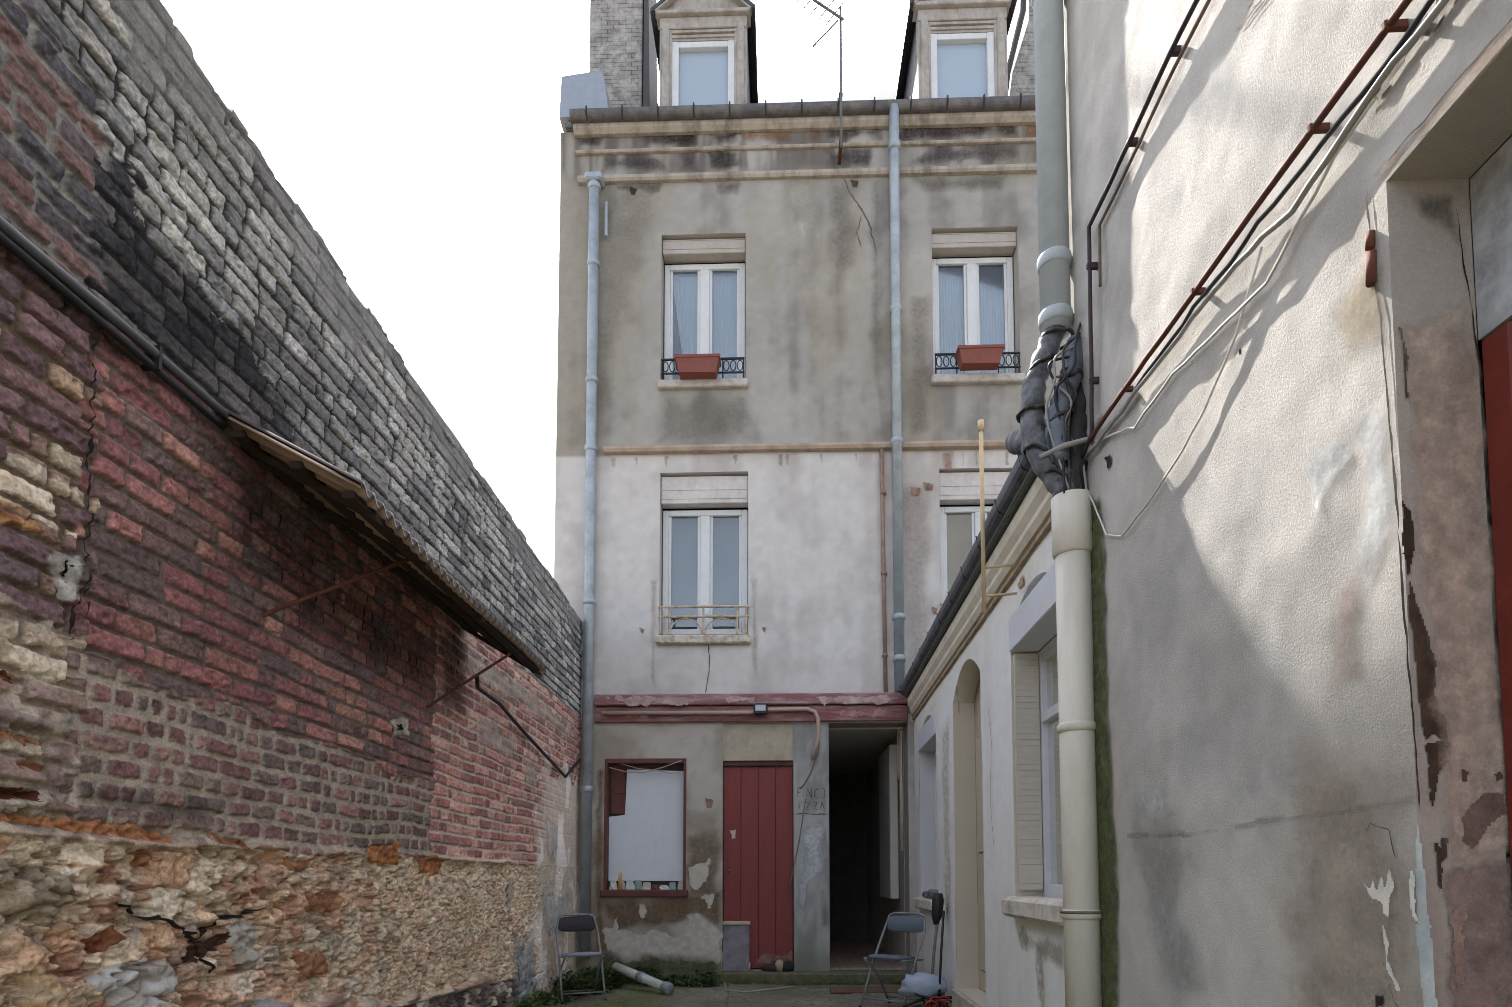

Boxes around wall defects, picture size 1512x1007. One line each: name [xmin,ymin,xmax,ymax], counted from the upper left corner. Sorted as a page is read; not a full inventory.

water stain [711,151,736,167]
crack [843,178,877,255]
crack [69,315,102,640]
spalling [0,508,42,534]
peeling [1364,304,1508,1007]
peeling [605,695,696,718]
peeling [816,694,897,717]
crack [115,901,266,974]